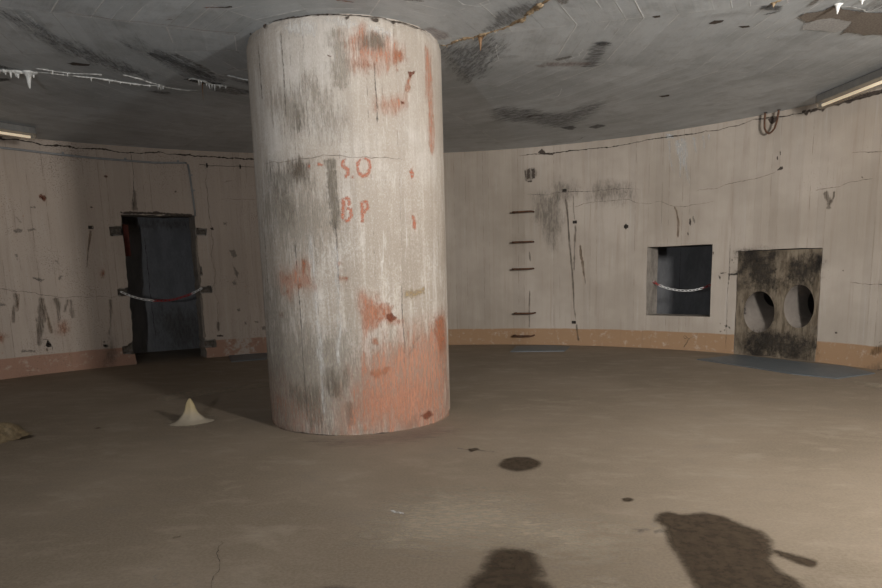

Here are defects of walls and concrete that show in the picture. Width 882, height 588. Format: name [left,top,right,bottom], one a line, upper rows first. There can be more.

damp [0,11,249,95]
rust [351,28,404,70]
damp [441,0,549,78]
peeling [798,6,882,36]
rust [425,46,434,152]
rust [359,296,400,345]